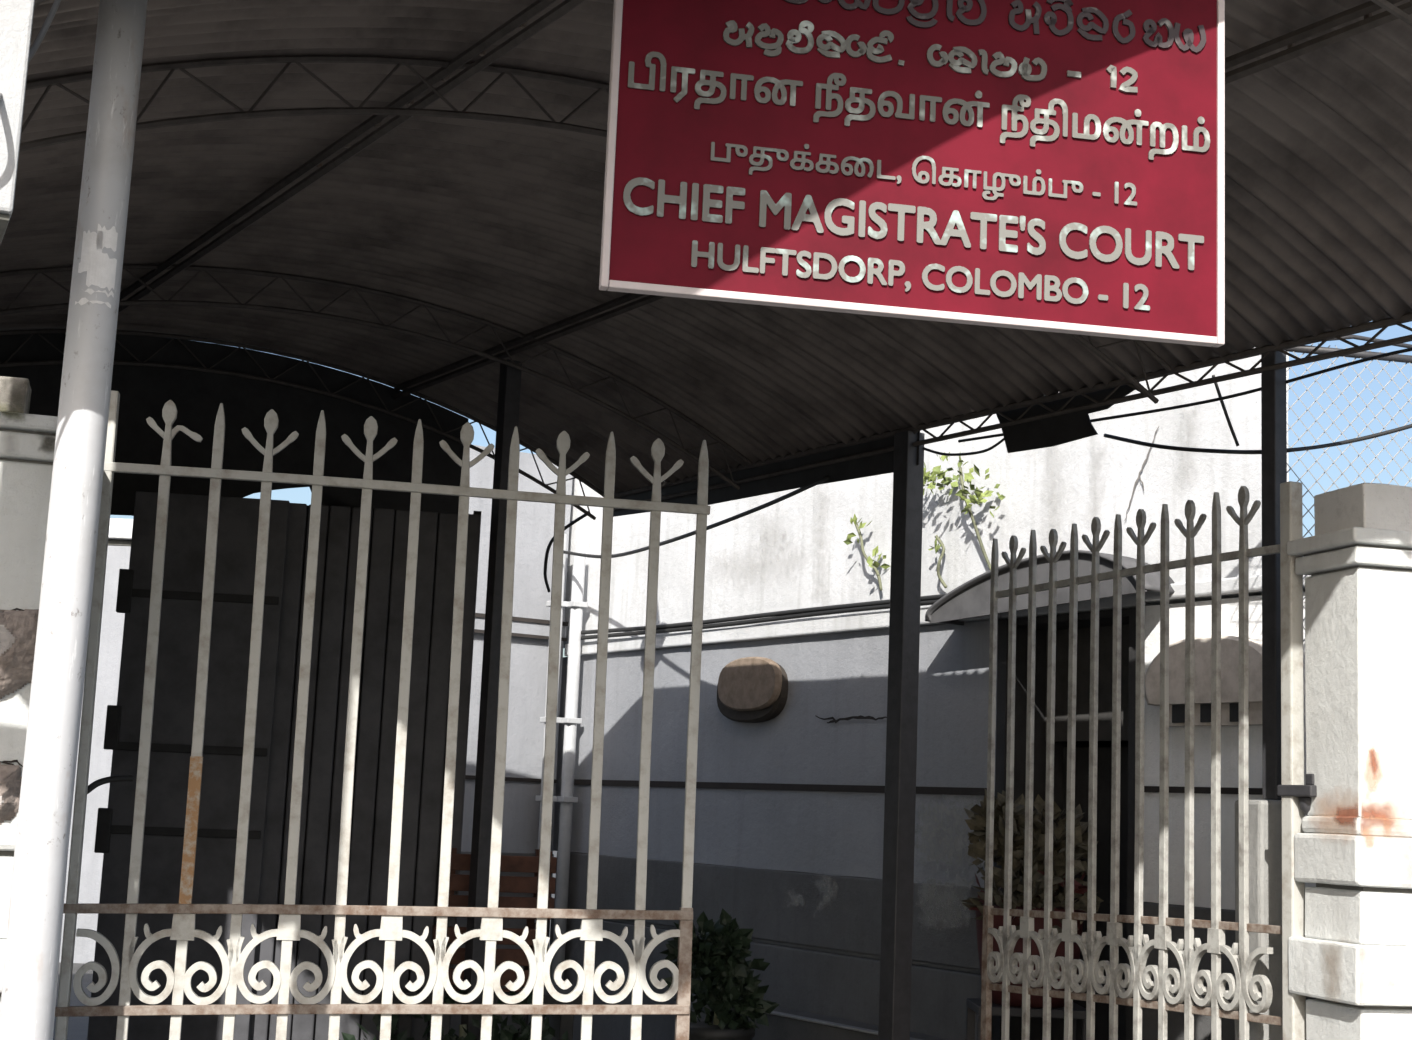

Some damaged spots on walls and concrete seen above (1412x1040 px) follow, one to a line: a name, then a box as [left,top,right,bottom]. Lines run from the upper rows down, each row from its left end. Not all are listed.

crack [815,715,887,723]
corrosion [1335,808,1391,825]